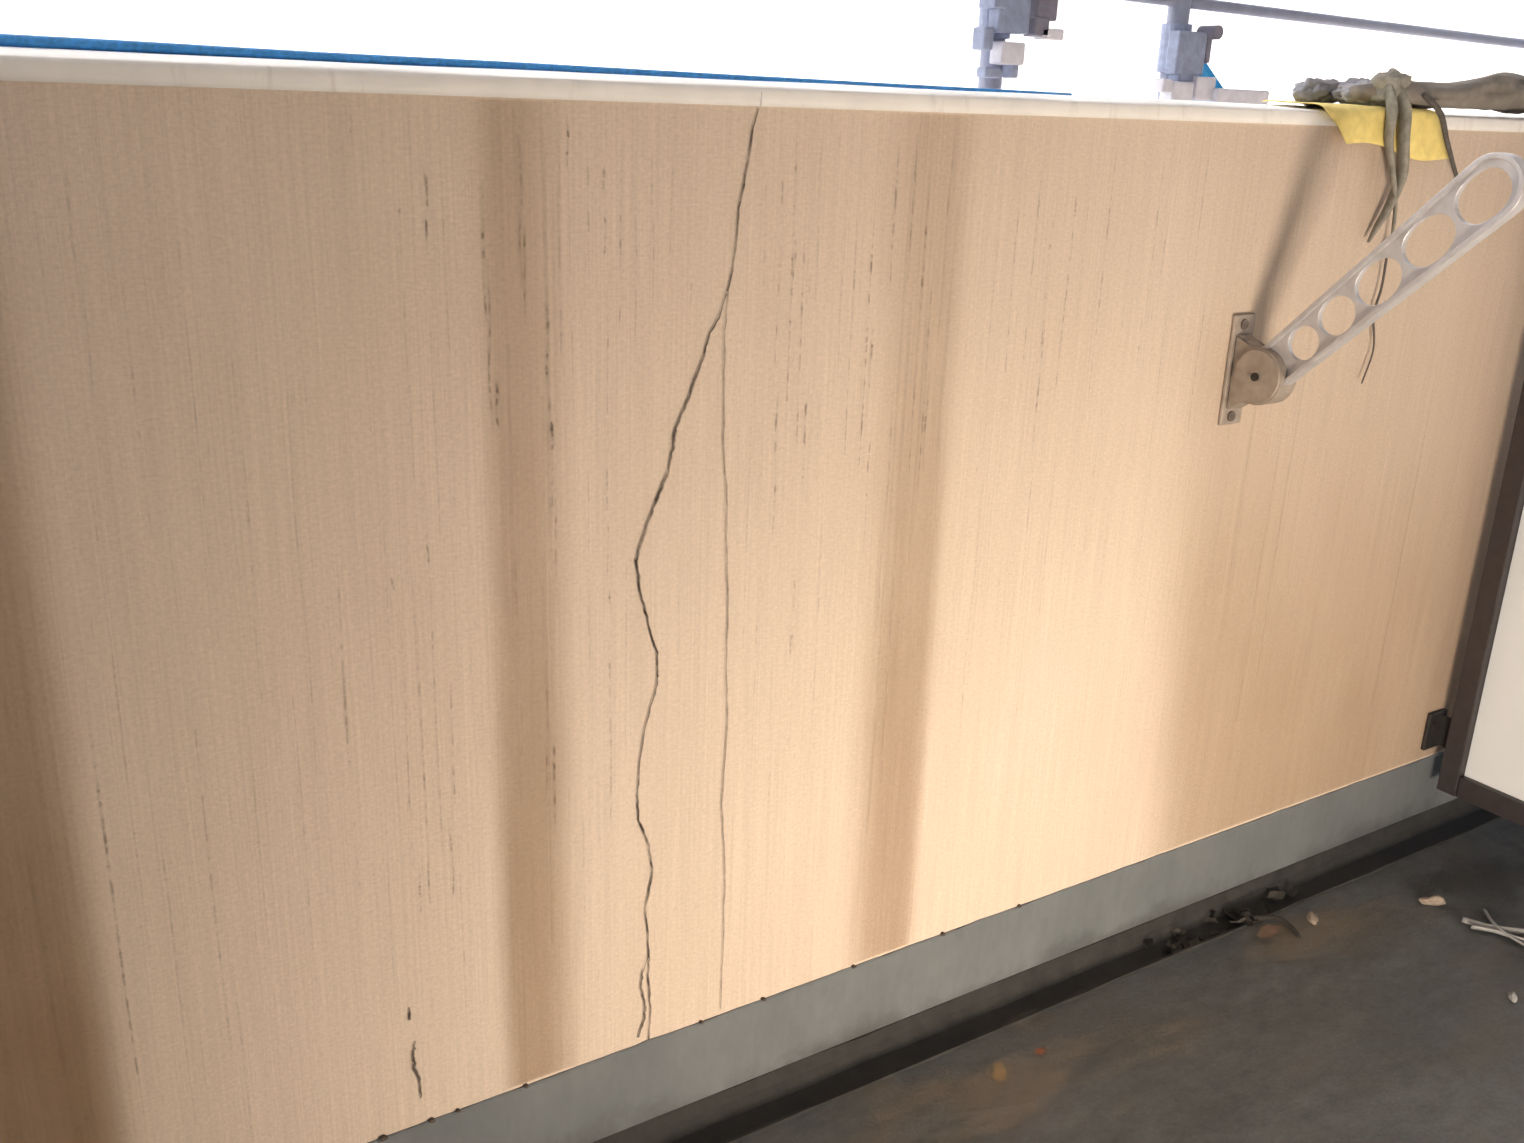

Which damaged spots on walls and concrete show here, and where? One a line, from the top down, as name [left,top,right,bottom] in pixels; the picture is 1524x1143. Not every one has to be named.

crack [635,108,759,1040]